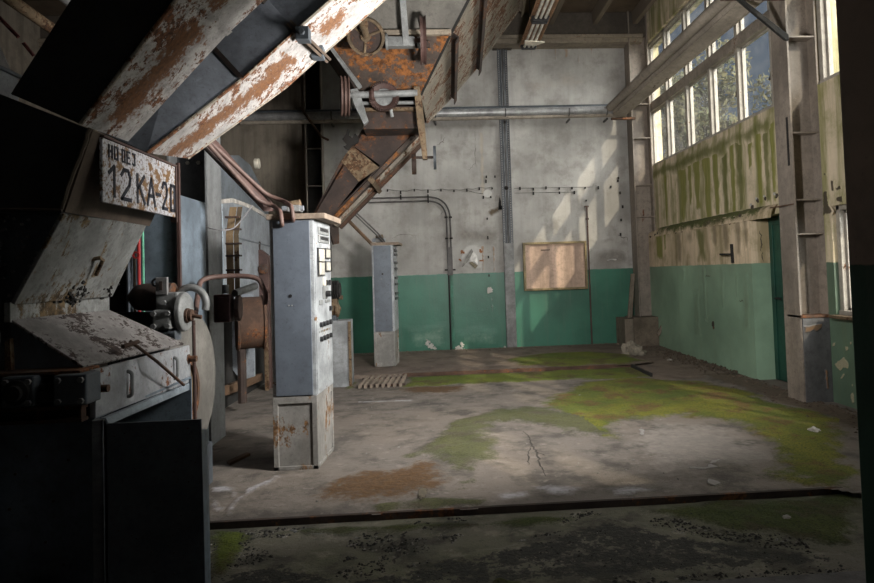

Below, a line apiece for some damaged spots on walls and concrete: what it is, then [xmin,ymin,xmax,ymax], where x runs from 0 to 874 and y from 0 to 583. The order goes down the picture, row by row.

damp [653,110,778,339]
crack [523,431,546,476]